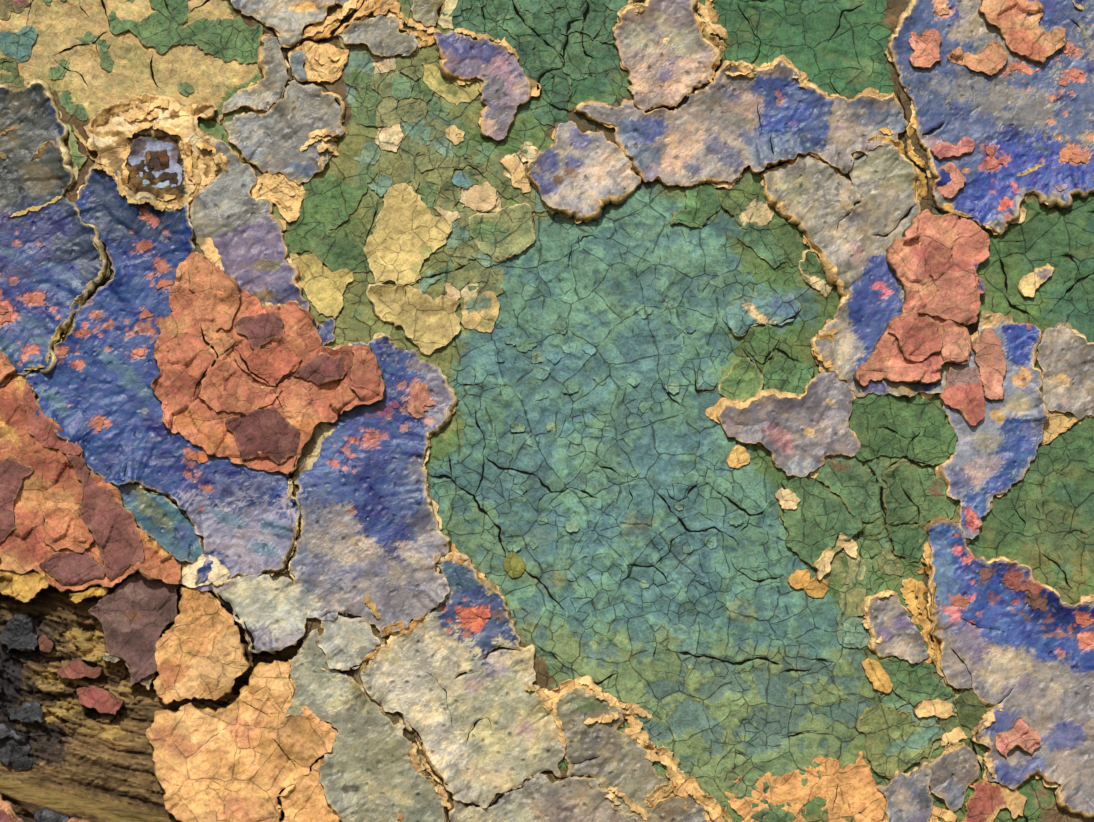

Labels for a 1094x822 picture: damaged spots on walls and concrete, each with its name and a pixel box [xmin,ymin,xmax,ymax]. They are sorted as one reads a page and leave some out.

crack [265,0,364,106]
peeling [410,0,1094,235]
peeling [1017,263,1054,298]
peeling [0,0,504,705]
crack [322,611,362,619]
crack [428,382,597,611]
crack [427,647,617,742]
peeling [145,121,1027,822]
crack [587,458,788,582]
crack [653,637,832,680]
crack [858,427,932,559]
peeling [816,310,1094,818]